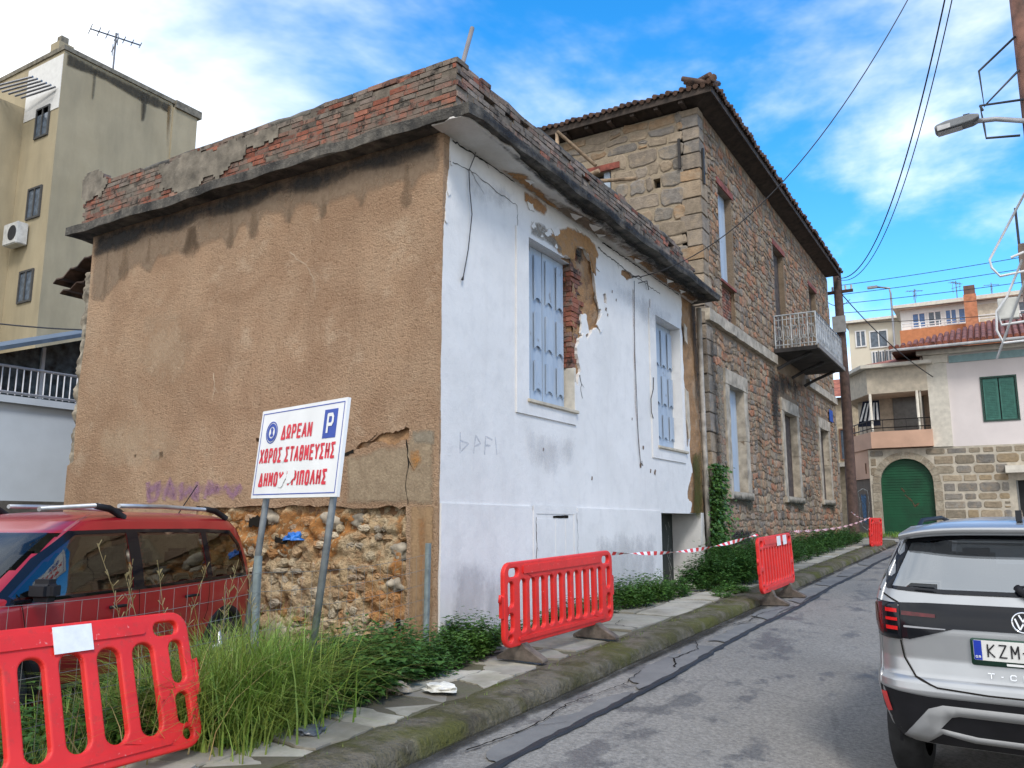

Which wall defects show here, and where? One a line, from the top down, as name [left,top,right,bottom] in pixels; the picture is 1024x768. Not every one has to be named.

leakage [67,55,171,124]
leakage [92,142,437,299]
crack [450,140,518,220]
spalling [505,171,617,374]
crack [405,439,414,501]
spalling [198,505,407,651]
crack [466,641,699,750]